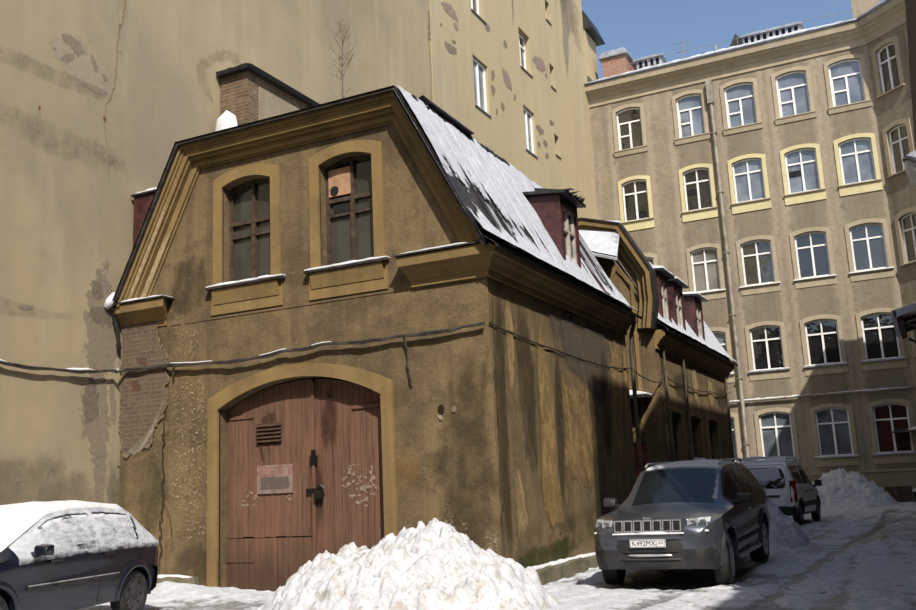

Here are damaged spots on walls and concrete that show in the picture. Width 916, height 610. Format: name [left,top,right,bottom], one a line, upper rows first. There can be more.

peeling [53,33,107,81]
crack [104,0,126,177]
flaking render [440,2,458,55]
flaking render [491,68,516,115]
flaking render [532,56,547,77]
damp [556,0,574,71]
flaking render [78,260,207,539]
damp [496,302,630,539]
crack [159,407,172,571]
damp [519,536,575,568]